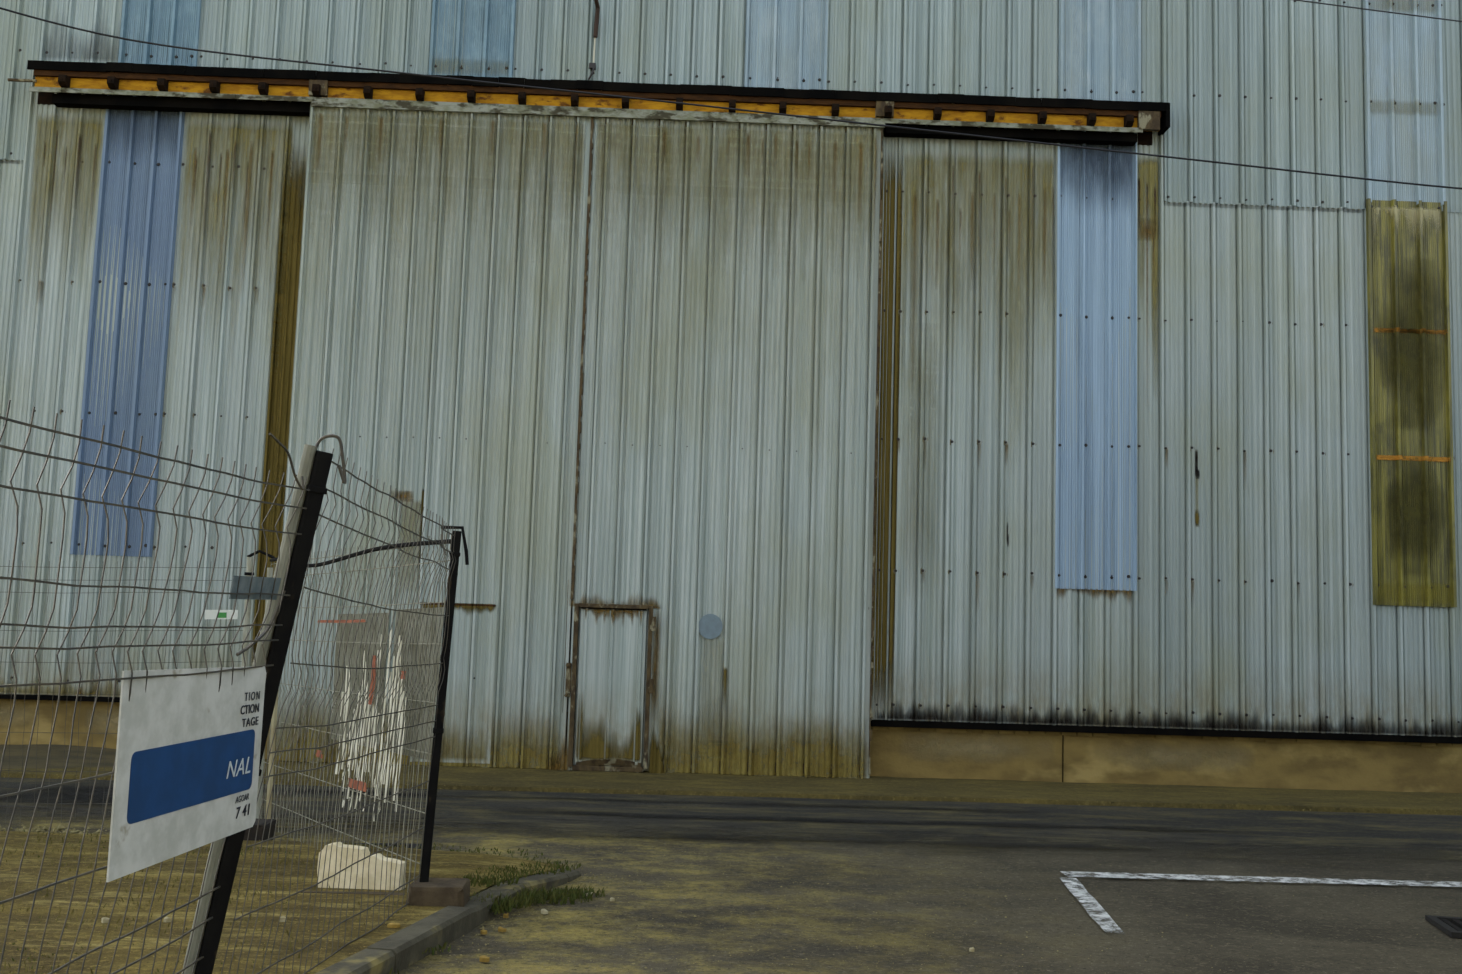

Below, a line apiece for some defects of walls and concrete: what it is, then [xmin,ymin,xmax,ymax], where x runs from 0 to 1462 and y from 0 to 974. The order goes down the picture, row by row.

rust [599,124,707,176]
rust [1138,160,1158,331]
rust [186,125,306,577]
rust [719,129,1053,694]
rust [396,490,424,557]
rust [251,599,266,667]
rust [571,600,659,621]
rust [549,705,666,774]